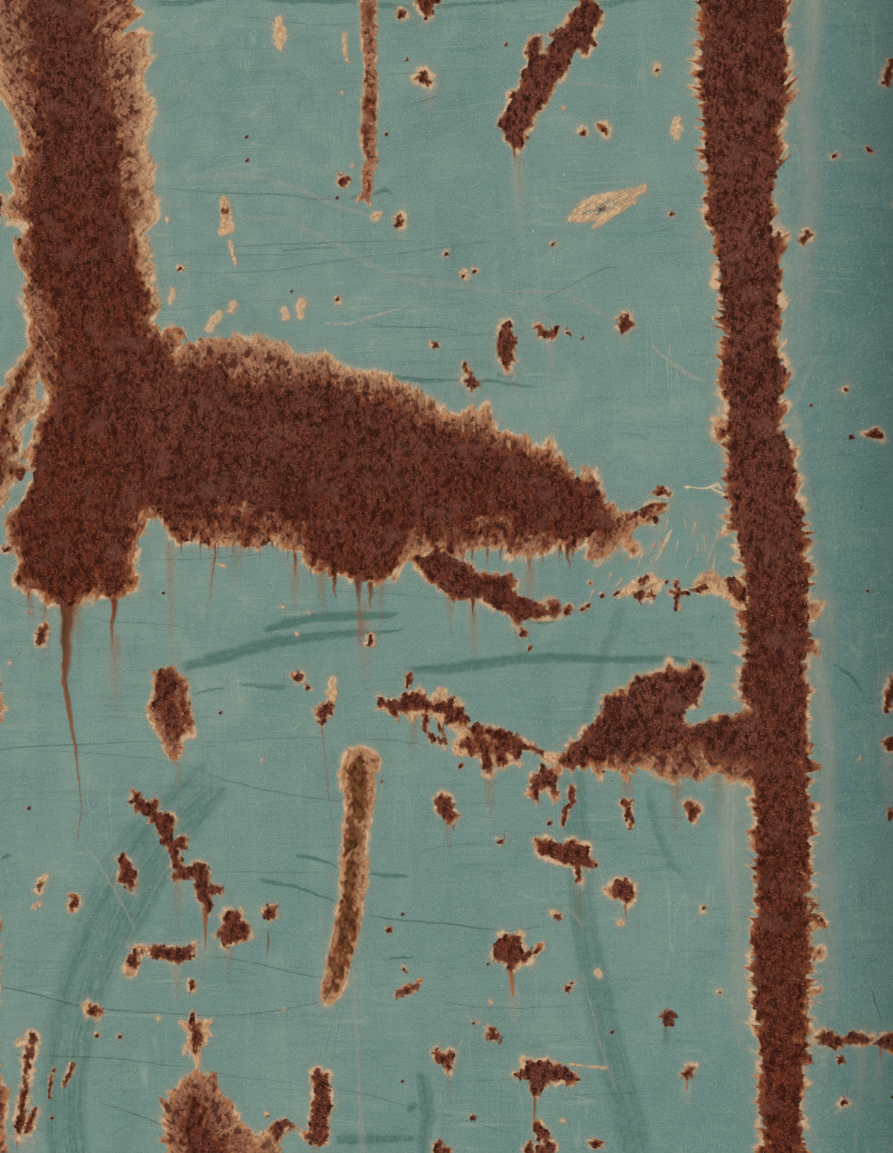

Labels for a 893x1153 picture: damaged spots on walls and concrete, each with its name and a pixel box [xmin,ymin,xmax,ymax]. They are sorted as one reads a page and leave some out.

peeling [568,184,647,229]
rust [0,0,674,789]
rust [376,0,893,1153]
rust [116,852,139,894]
rust [121,789,278,994]
rust [321,745,384,1008]
rust [0,1028,75,1153]
rust [158,1011,336,1153]